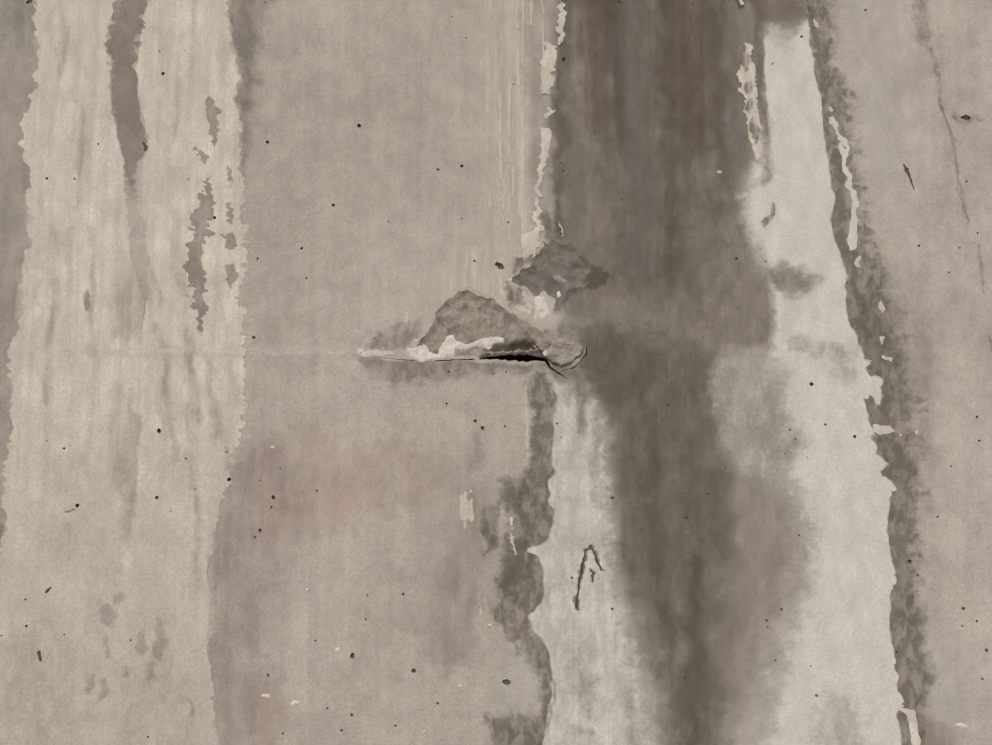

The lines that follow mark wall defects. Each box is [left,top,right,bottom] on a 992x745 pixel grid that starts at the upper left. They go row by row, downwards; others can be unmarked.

damp [0,0,251,745]
crack [388,347,587,379]
spalling [406,1,591,367]
damp [482,0,943,745]
crack [573,545,604,610]